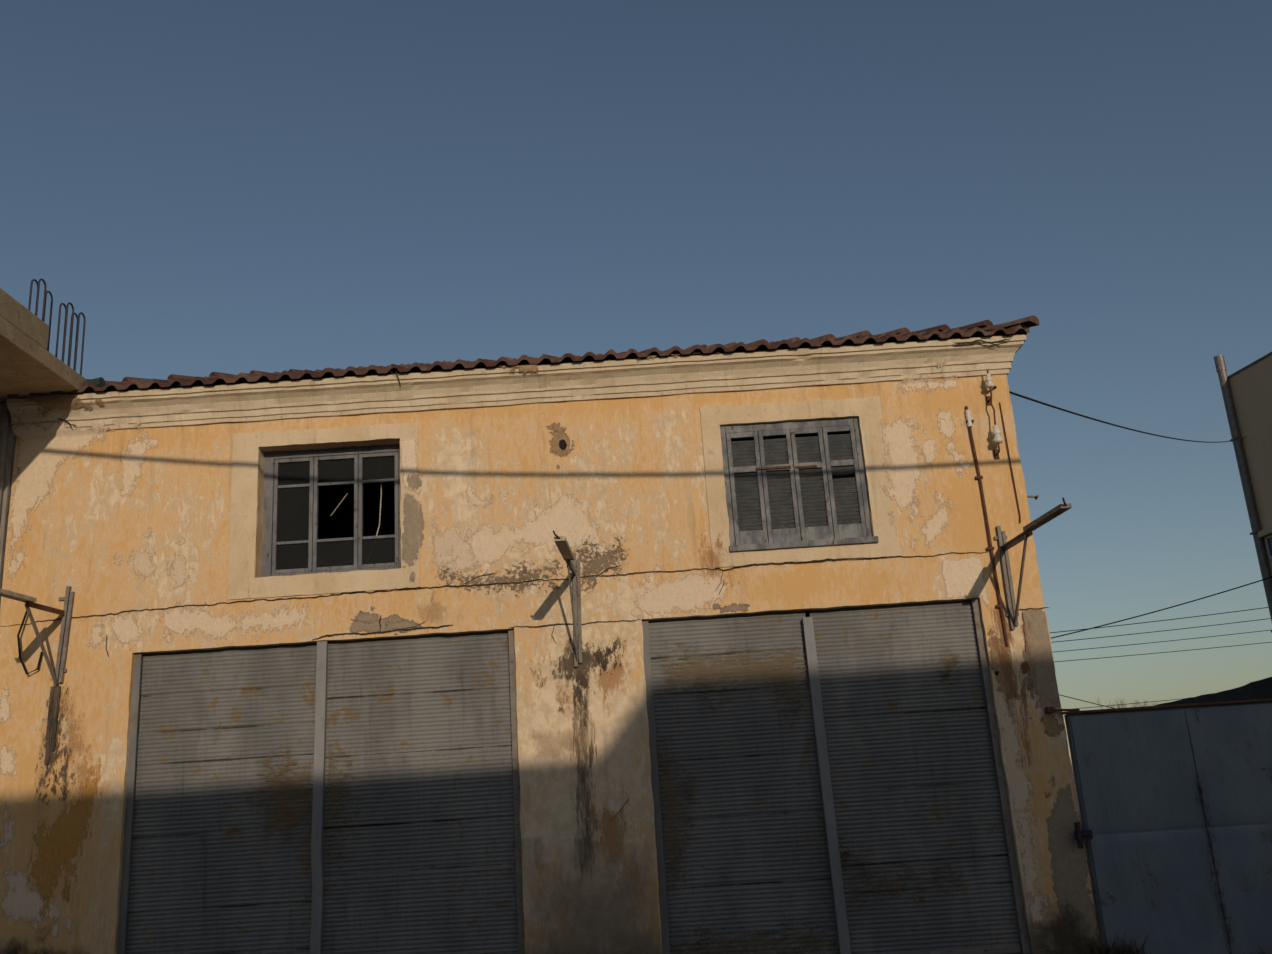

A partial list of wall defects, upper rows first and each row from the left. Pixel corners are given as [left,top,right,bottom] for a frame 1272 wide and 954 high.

peeling [4,394,119,599]
peeling [120,420,158,498]
spalling [350,607,423,635]
peeling [401,438,630,597]
spalling [547,423,574,469]
peeling [878,409,975,551]
peeling [942,556,989,607]
leakage [35,686,75,804]
leakage [531,637,624,873]
peeling [988,608,1098,950]